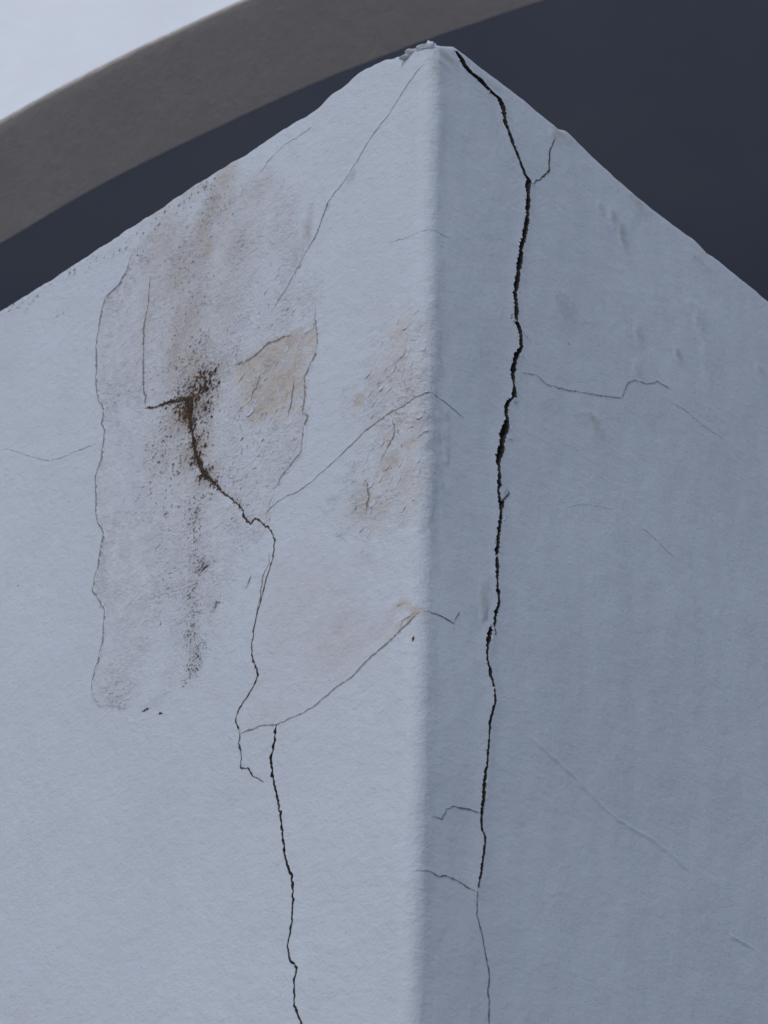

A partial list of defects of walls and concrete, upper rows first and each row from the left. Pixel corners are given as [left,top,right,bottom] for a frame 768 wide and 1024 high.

peeling [89,251,185,714]
corrosion [113,256,264,530]
damp [89,137,294,392]
peeling [200,134,326,661]
damp [121,337,429,758]
damp [283,184,321,309]
crack [142,51,670,1024]